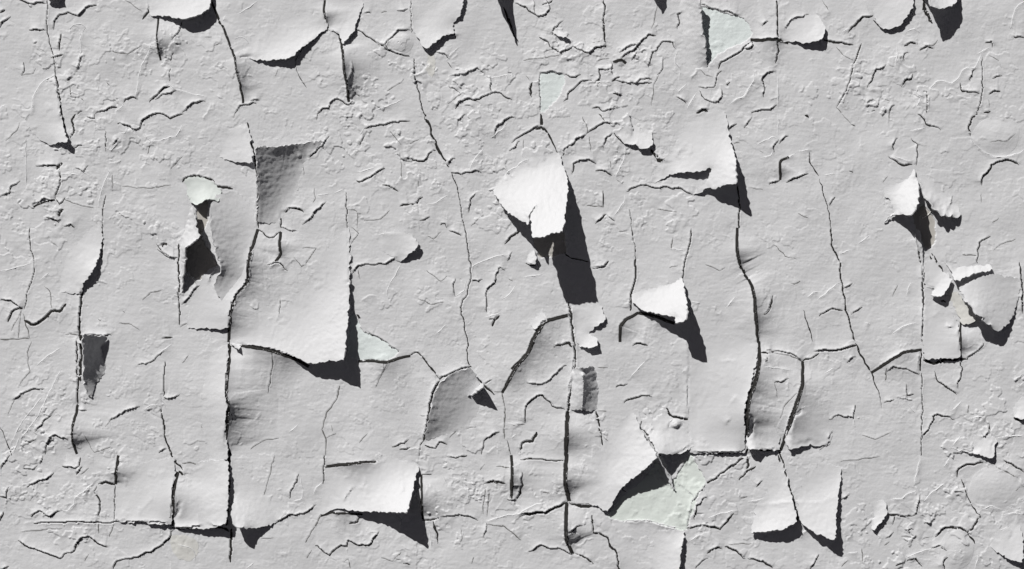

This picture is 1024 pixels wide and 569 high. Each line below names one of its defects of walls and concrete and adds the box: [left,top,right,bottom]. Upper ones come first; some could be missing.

crack [1,0,316,562]
peeling [147,0,211,39]
peeling [113,124,431,569]
crack [275,0,620,569]
peeling [385,0,512,119]
peeling [473,0,776,324]
crack [618,210,689,342]
peeling [570,337,856,569]
crack [696,0,789,114]
crack [649,152,1024,522]
peeling [884,138,1021,395]
crack [957,437,1024,544]